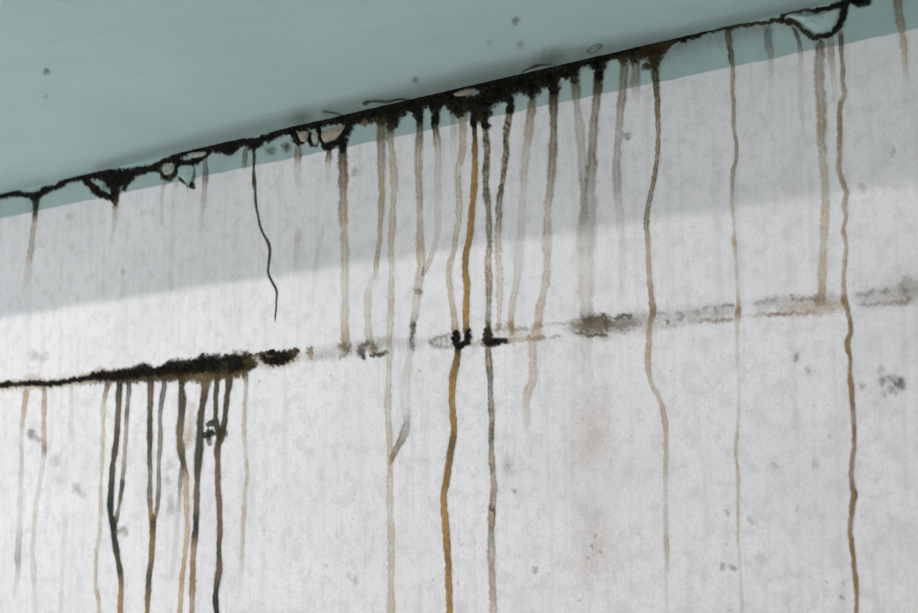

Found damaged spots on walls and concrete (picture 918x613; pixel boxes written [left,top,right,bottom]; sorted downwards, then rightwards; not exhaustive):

water stain [0,347,313,613]
water stain [326,150,349,245]
water stain [338,322,391,367]
water stain [414,114,440,294]
crack [0,0,871,320]
rust [440,348,461,613]
rust [462,121,478,335]
water stain [450,110,514,611]
water stain [545,93,558,207]
water stain [570,312,635,338]
rust [836,31,848,205]
rust [840,218,858,613]